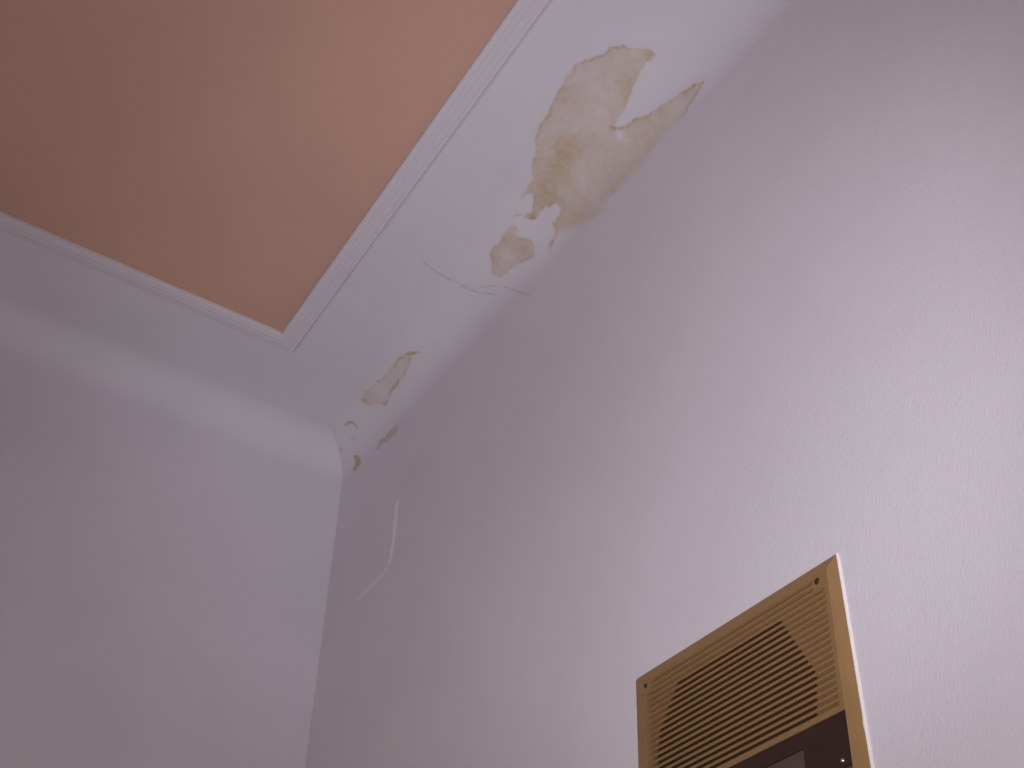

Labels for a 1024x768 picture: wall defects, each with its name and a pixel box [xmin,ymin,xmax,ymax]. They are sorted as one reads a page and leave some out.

leakage [487,42,706,279]
leakage [359,349,423,408]